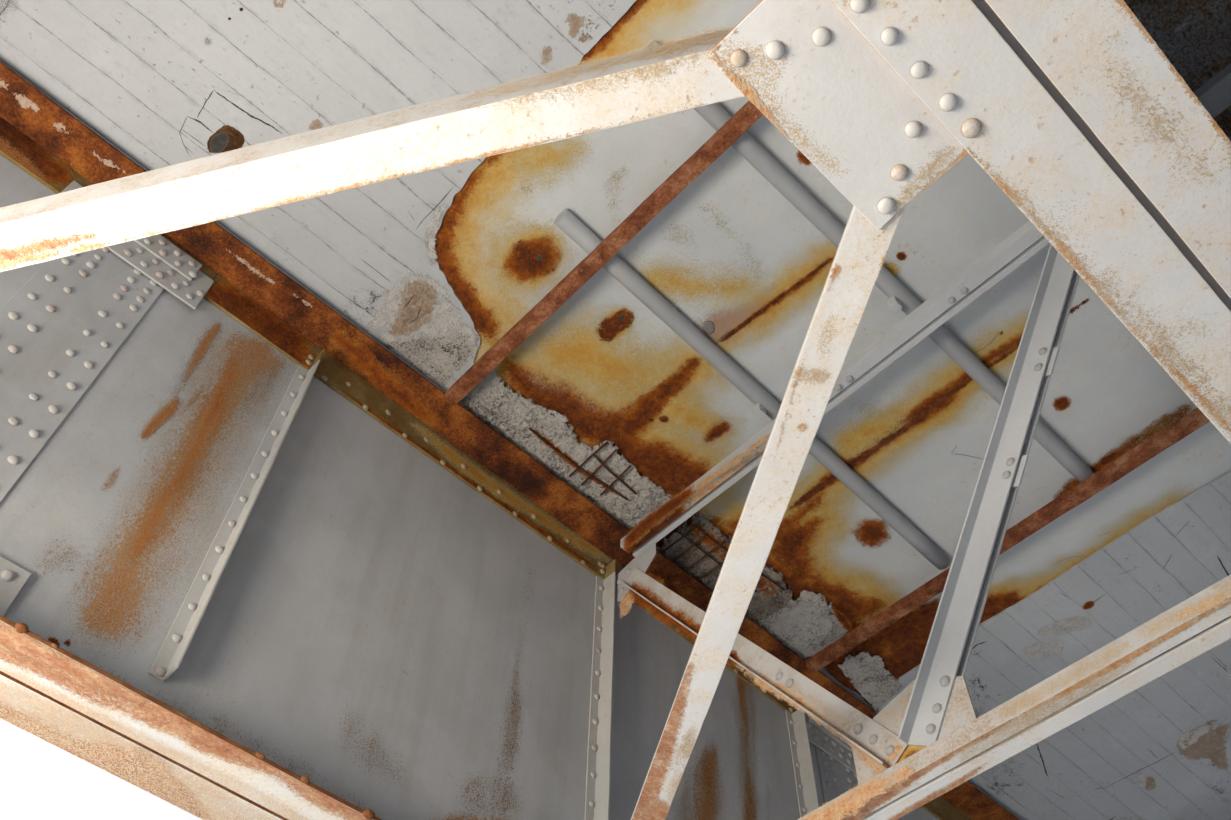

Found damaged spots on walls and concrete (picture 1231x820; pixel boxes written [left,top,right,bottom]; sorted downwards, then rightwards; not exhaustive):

rust [138,277,318,442]
rust [0,100,716,363]
spalling [344,203,480,387]
spalling [461,368,672,529]
rust [495,304,837,554]
rust [893,142,1231,473]
rust [0,621,385,820]
spalling [656,512,732,591]
spalling [745,564,853,658]
rust [765,456,906,635]
spalling [838,652,902,711]
peeling [1177,720,1230,771]